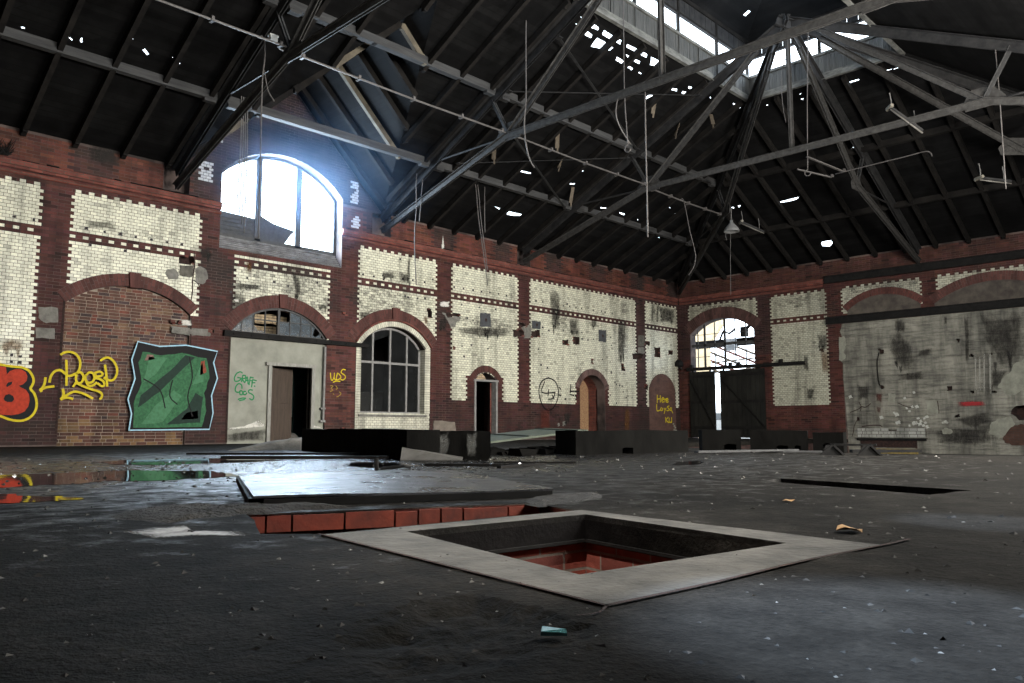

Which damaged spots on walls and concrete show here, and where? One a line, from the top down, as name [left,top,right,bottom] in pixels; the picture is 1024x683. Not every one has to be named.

leakage [975,352,1012,391]
peeling [989,359,1024,446]